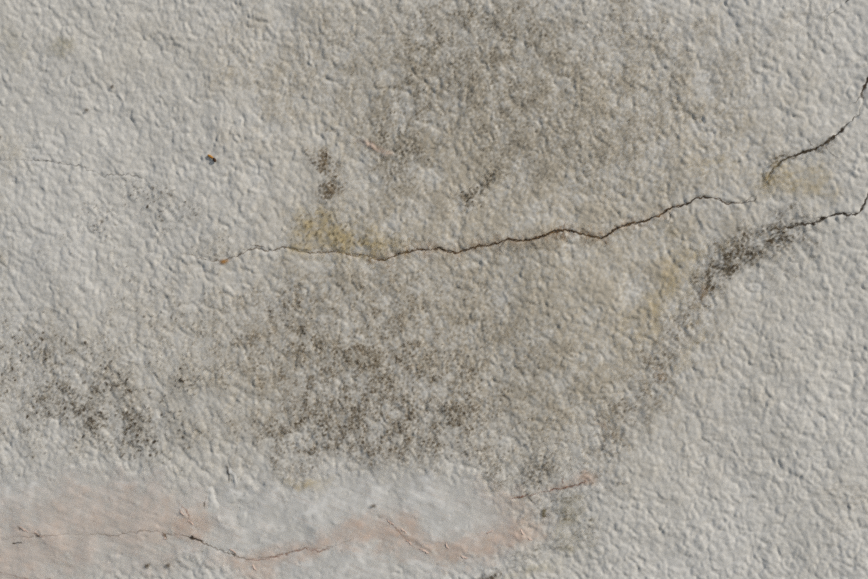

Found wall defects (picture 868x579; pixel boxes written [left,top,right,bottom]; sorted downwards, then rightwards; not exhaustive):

crack [767,118,854,179]
crack [205,196,734,263]
leakage [696,221,797,289]
crack [775,195,868,230]